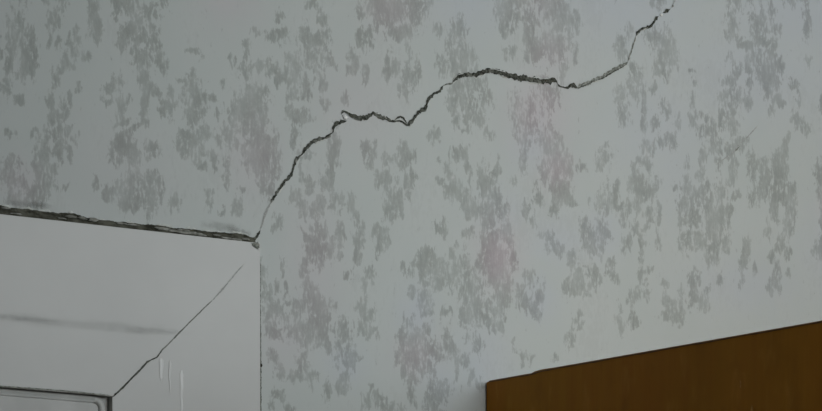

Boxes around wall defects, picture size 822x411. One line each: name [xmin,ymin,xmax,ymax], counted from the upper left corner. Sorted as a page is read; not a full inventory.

crack [253,0,676,240]
crack [0,263,262,411]